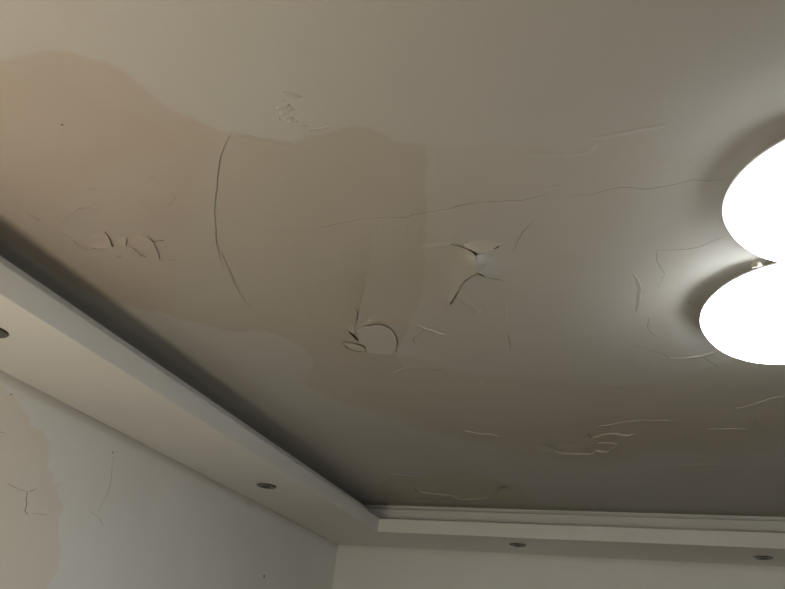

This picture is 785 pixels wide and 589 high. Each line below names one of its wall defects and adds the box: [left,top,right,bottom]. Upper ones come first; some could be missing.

crack [214,137,245,301]
leakage [0,46,785,466]
leakage [0,384,65,589]